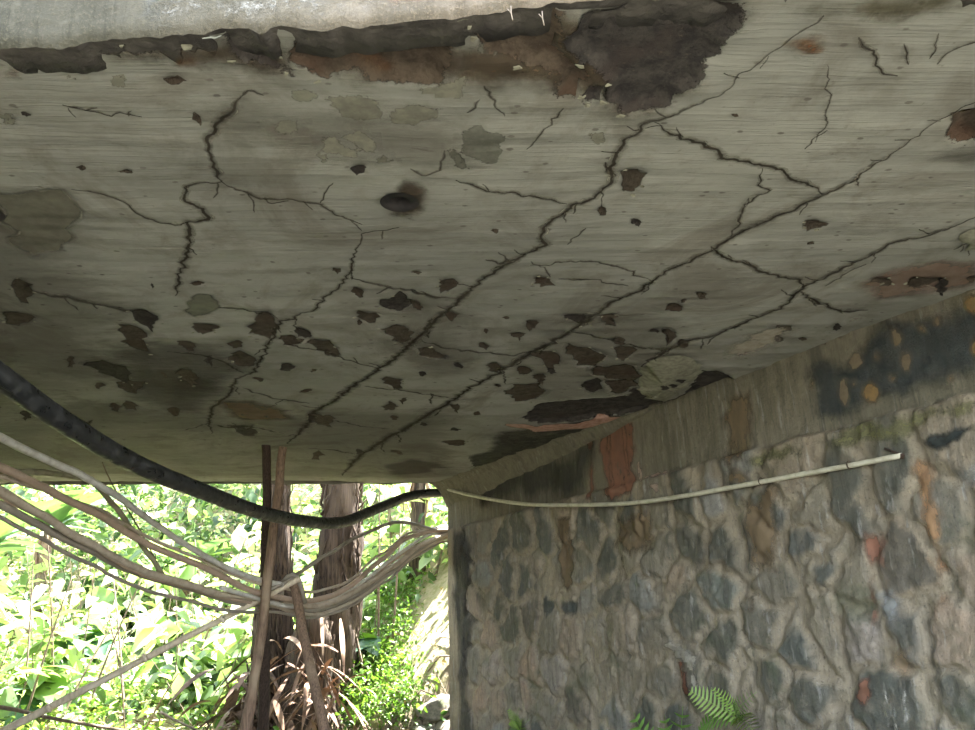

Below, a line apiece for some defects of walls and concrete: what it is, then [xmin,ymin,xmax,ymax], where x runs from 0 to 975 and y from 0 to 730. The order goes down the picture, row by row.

spalling [459,0,747,118]
damp [394,182,424,215]
crack [63,17,975,476]
crack [34,291,148,311]
spalling [67,356,148,412]
spalling [118,310,158,355]
spalling [177,323,220,351]
spalling [227,312,340,382]
spalling [352,289,463,368]
spalling [495,314,733,425]
damp [810,310,975,416]
rust [586,423,636,501]